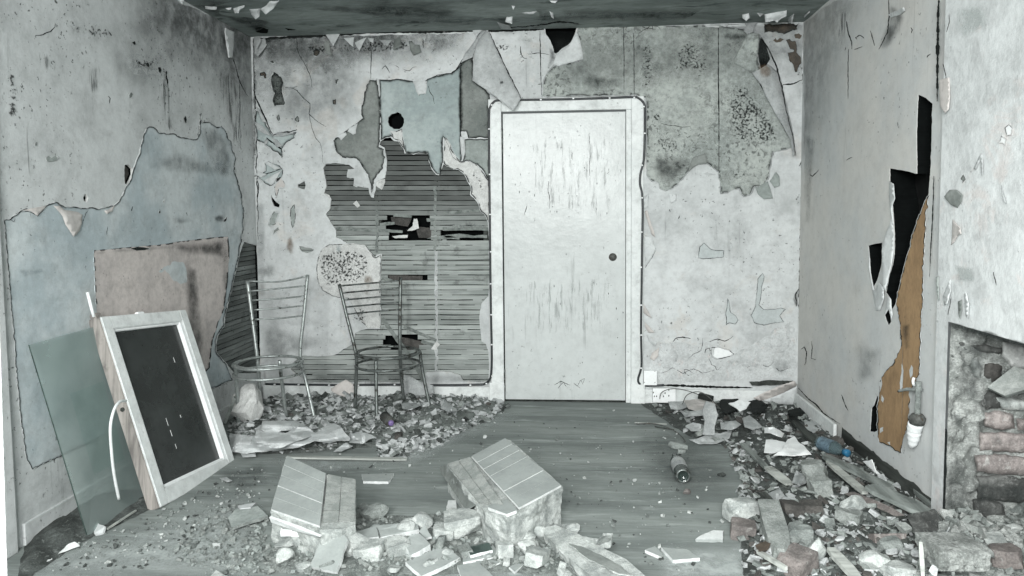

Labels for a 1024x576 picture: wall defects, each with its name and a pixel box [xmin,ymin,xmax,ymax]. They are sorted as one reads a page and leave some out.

spalling [497,0,576,53]
peeling [742,10,810,73]
leakage [731,86,776,143]
peeling [688,153,707,172]
peeling [755,172,780,199]
flaking render [291,57,490,383]
peeling [4,115,261,470]
leakage [320,252,367,285]
peeling [698,243,724,259]
peeling [649,273,796,383]